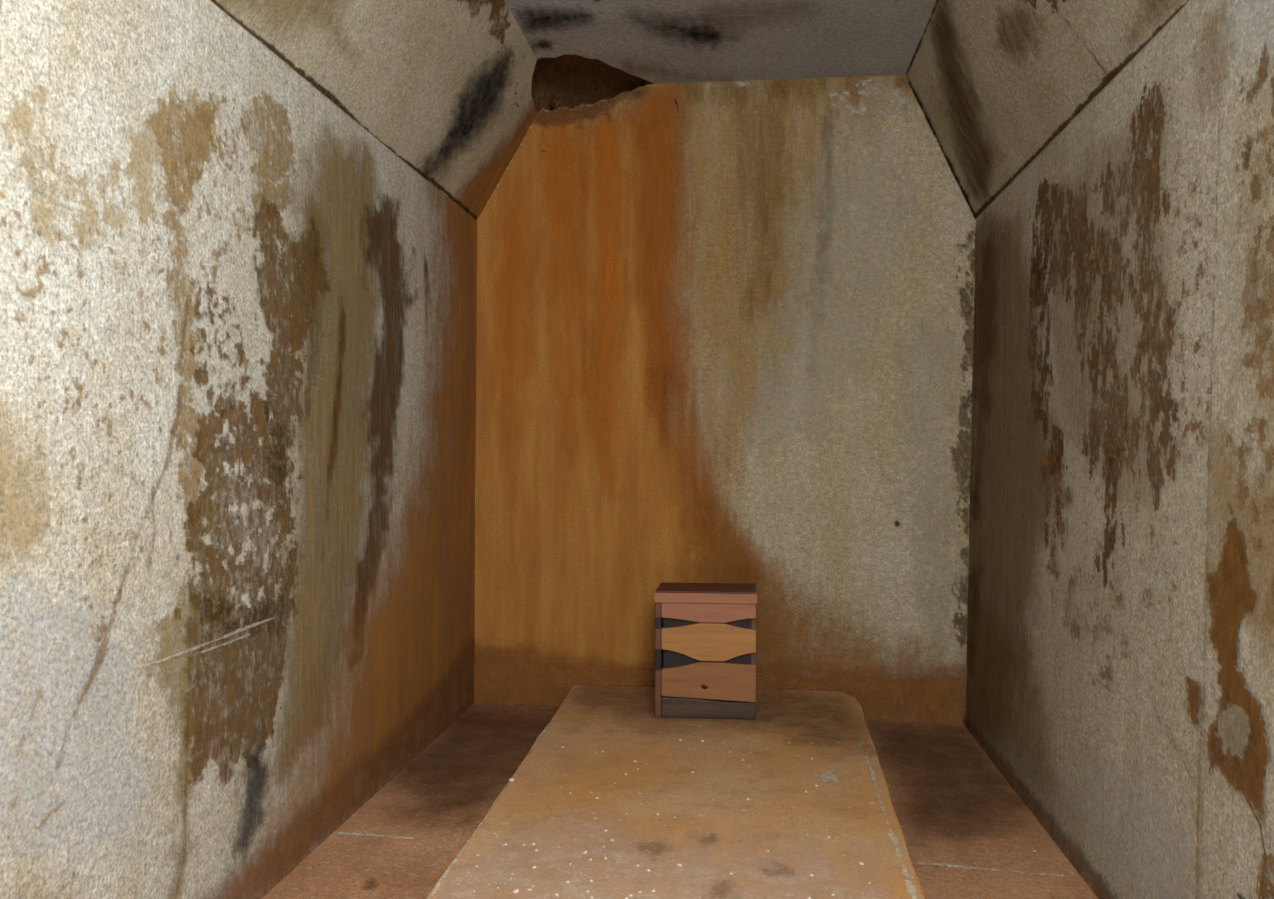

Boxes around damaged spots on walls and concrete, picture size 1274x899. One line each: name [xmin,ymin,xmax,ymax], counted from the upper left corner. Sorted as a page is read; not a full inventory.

damp [424,53,510,175]
damp [519,10,588,48]
spalling [514,54,655,114]
damp [237,139,412,849]
rust [294,94,755,827]
crack [1244,794,1266,899]